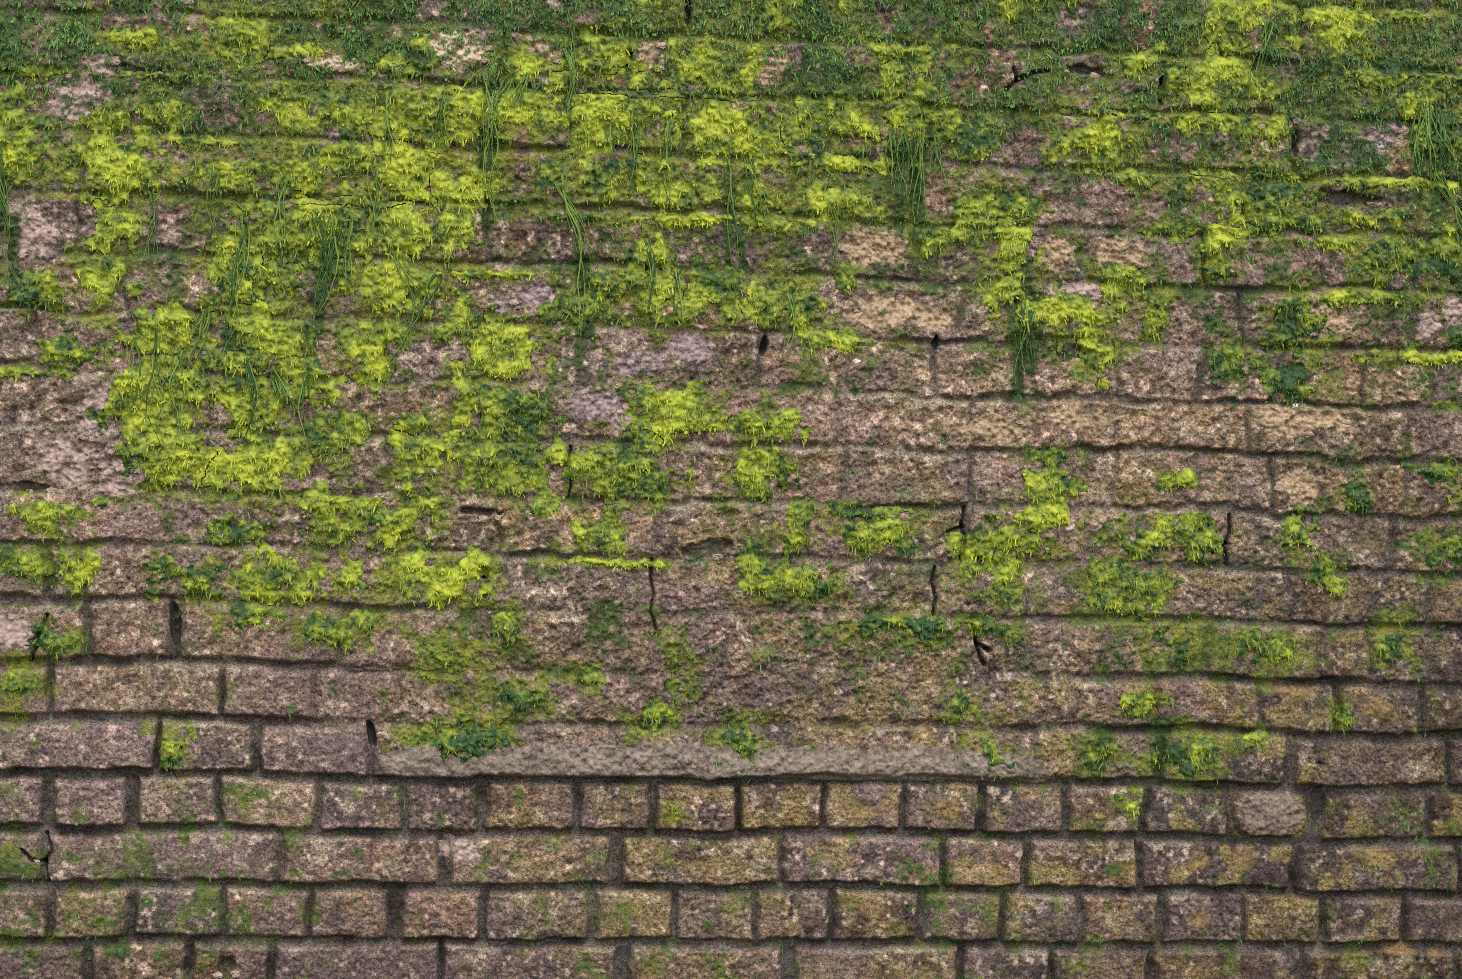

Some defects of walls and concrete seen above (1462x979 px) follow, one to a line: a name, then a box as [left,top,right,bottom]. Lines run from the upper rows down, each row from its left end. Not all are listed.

crack [649,558,657,630]
crack [930,506,965,616]